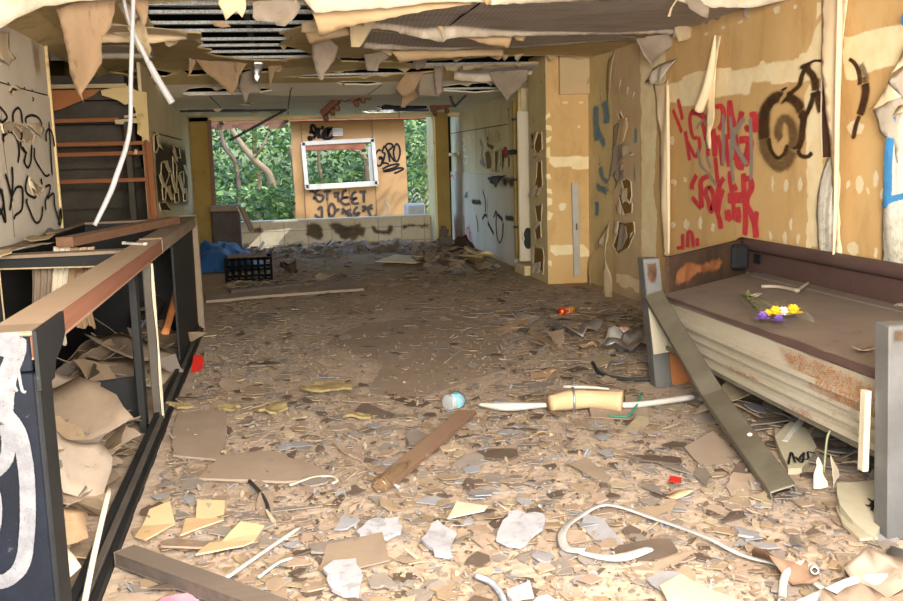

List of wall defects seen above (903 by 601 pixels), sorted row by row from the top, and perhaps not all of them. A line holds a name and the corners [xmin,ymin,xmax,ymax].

peeling [613,42,640,302]
rust [779,347,875,416]